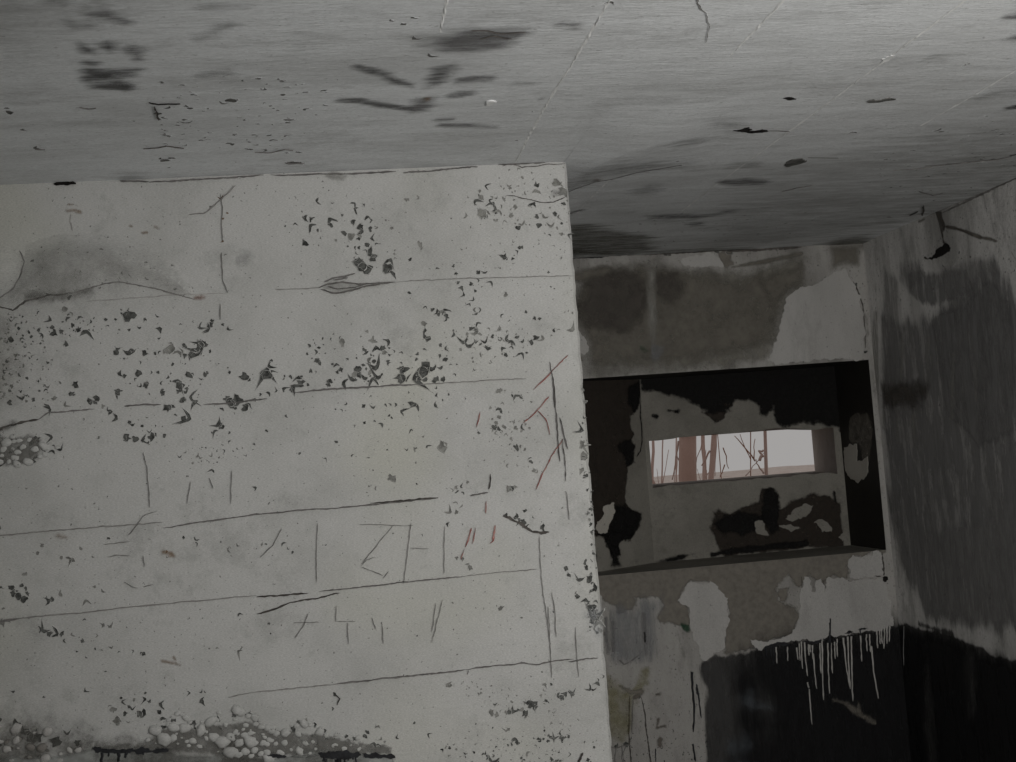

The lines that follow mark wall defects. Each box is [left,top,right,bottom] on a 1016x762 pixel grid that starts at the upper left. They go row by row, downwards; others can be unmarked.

spalling [144,84,213,168]
spalling [218,77,338,165]
crack [0,251,223,311]
spalling [177,168,575,477]
peeling [681,251,803,268]
peeling [768,268,868,365]
spalling [0,294,234,445]
spalling [0,429,64,468]
spalling [444,480,470,528]
peeling [563,414,894,661]
spalling [0,572,30,604]
spalling [37,618,146,658]